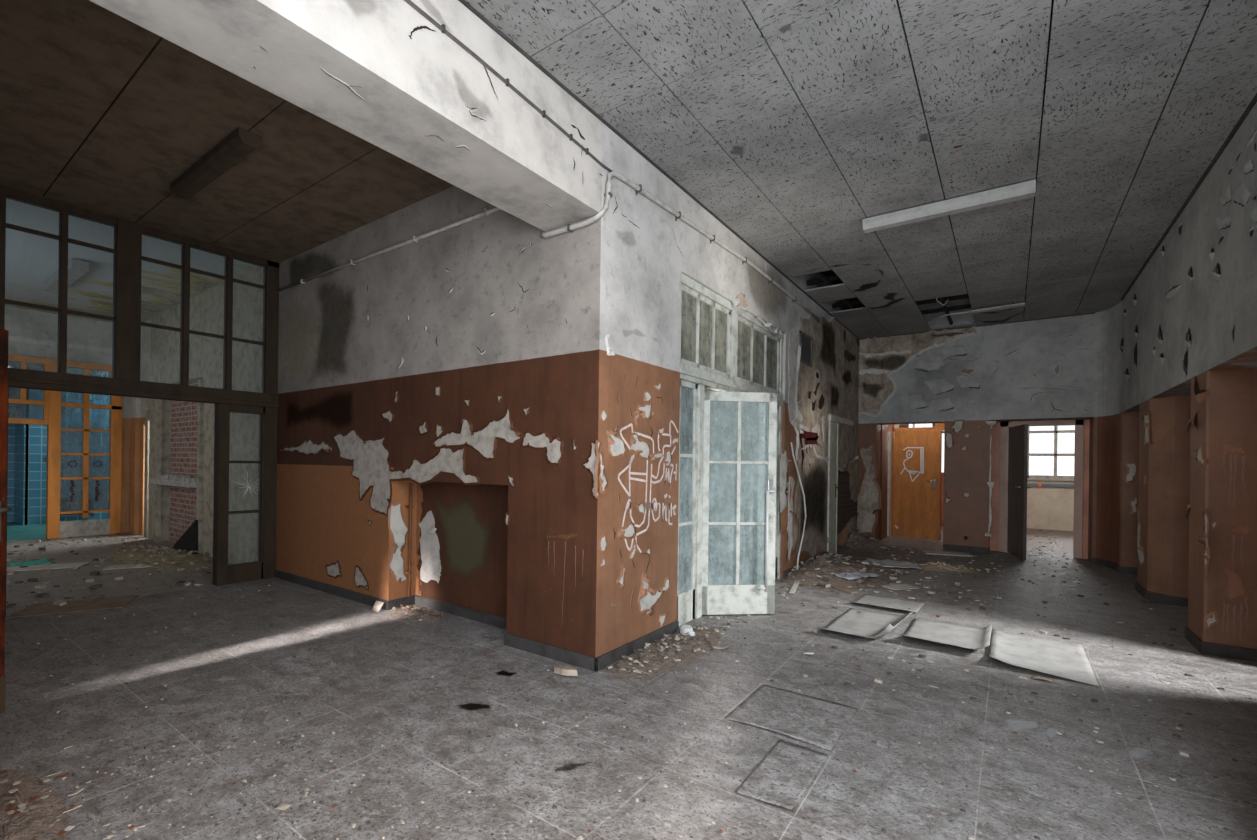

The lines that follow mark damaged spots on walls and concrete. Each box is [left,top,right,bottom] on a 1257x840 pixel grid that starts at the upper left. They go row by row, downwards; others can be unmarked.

damp [820,325,905,407]
flaking render [732,291,982,559]
peeling [279,382,679,589]
damp [802,467,826,532]
peeling [326,560,384,612]
peeling [637,571,670,628]